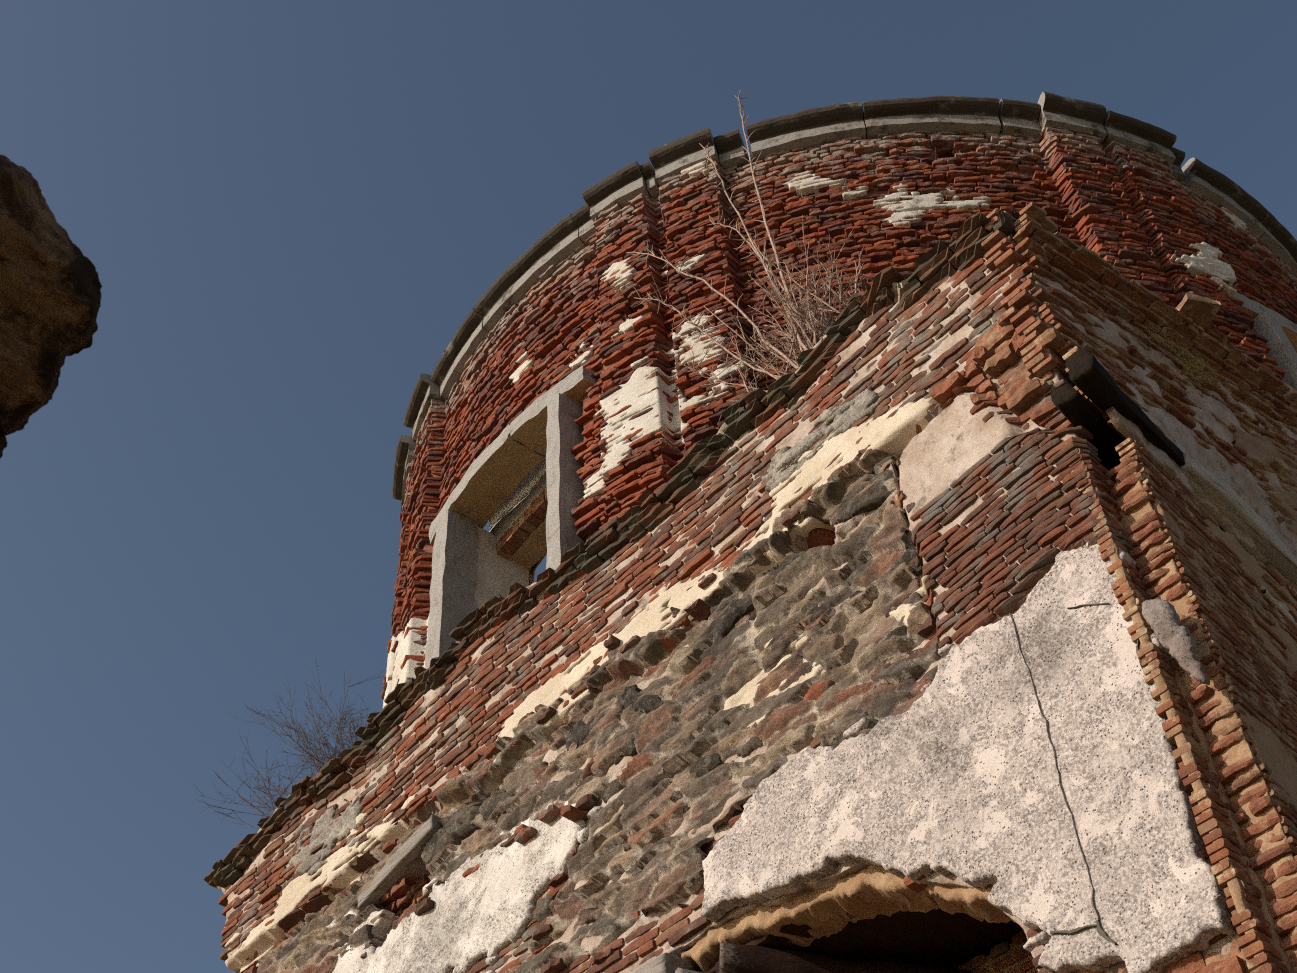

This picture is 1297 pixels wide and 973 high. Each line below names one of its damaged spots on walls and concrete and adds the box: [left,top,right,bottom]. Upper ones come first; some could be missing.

flaking render [680,160,710,178]
flaking render [784,171,992,227]
flaking render [600,254,706,293]
flaking render [1232,427,1297,535]
flaking render [489,309,1068,762]
crack [1067,602,1109,610]
flaking render [1258,582,1297,627]
flaking render [699,542,1251,973]
crack [1009,613,1118,945]
flaking render [319,801,603,973]